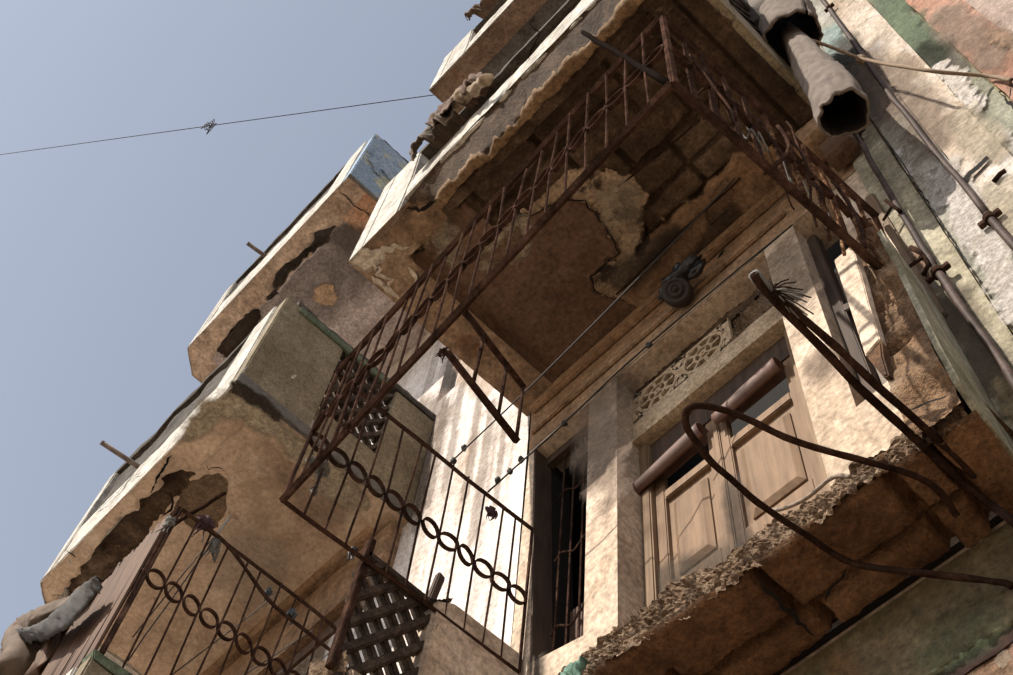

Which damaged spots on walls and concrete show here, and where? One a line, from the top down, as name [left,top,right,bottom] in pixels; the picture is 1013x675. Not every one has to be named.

spalling [431,0,762,297]
spalling [266,225,364,301]
spalling [62,470,228,596]
crack [760,576,815,637]
spalling [581,271,1013,675]
crack [825,570,846,601]